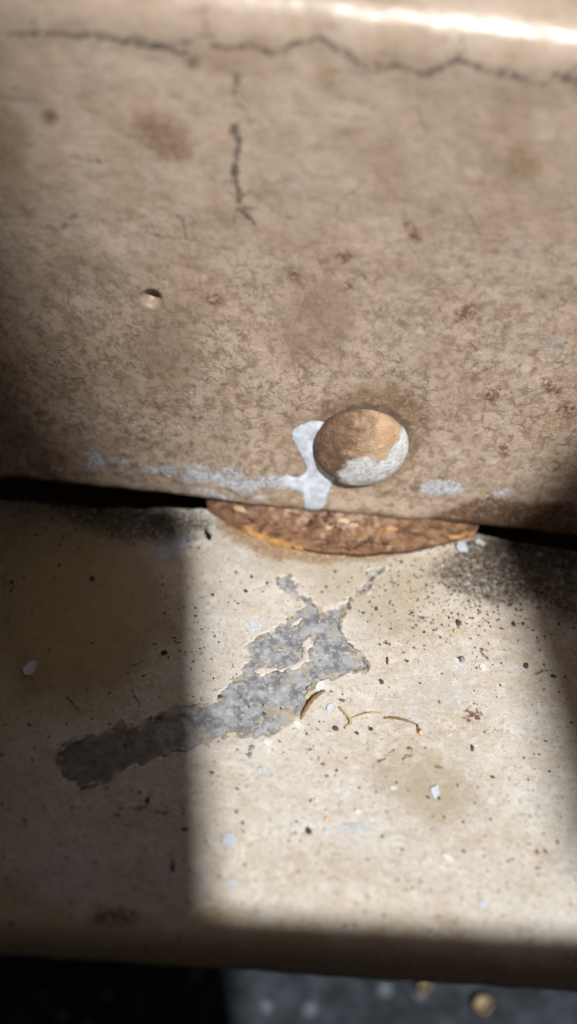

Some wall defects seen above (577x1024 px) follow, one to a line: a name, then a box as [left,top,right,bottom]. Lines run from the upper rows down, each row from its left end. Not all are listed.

crack [13,28,572,95]
crack [231,124,256,225]
peeling [55,567,385,791]